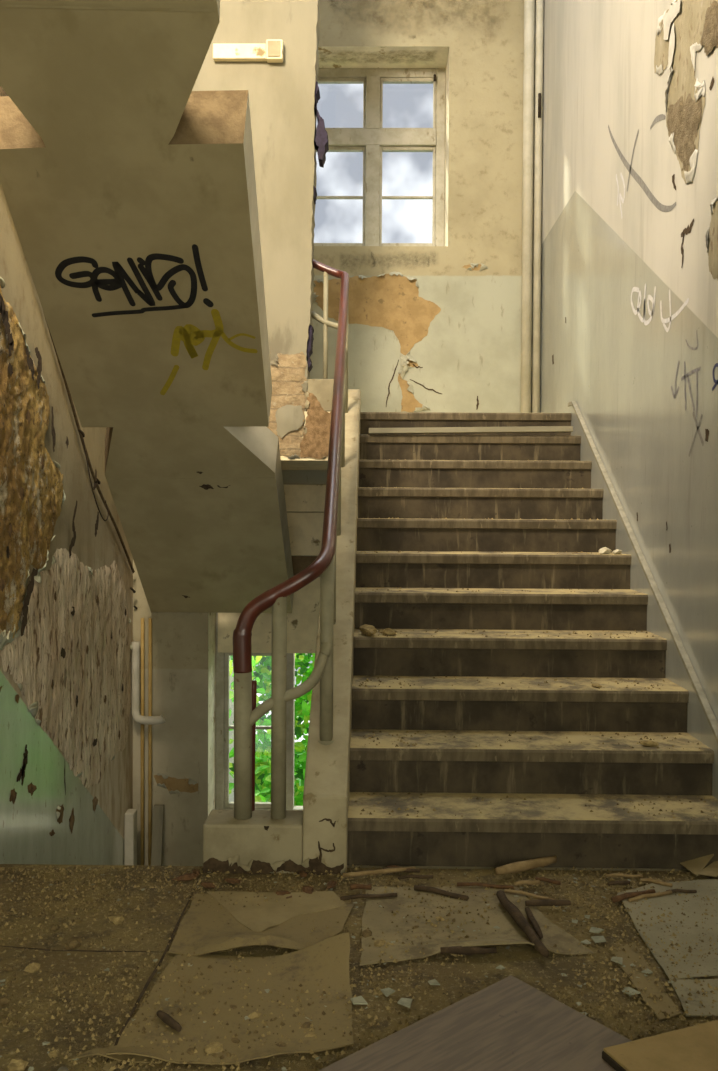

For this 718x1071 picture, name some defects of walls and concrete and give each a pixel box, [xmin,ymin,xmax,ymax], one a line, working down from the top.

peeling [654,0,718,190]
peeling [705,197,718,279]
flaking render [266,325,332,459]
peeling [313,271,442,412]
peeling [0,277,132,812]
spalling [49,804,75,836]